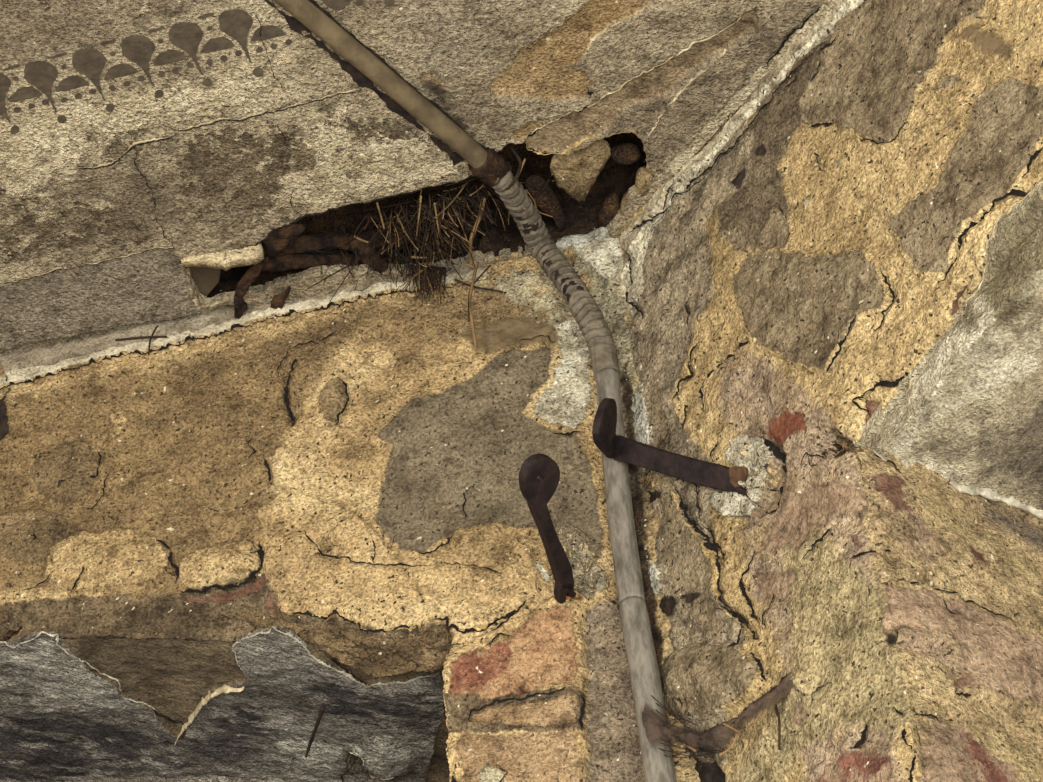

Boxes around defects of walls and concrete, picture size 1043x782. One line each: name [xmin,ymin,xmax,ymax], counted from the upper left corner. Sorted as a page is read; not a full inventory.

crack [2,8,360,284]
hole [241,175,496,249]
crack [939,147,1043,283]
peeling [733,208,885,369]
crack [825,270,895,373]
crack [157,540,264,593]
peeling [0,492,539,782]
peeling [640,471,724,640]
crack [667,483,774,680]
spalling [818,428,888,462]
crack [852,372,920,417]
peeling [946,480,1043,519]